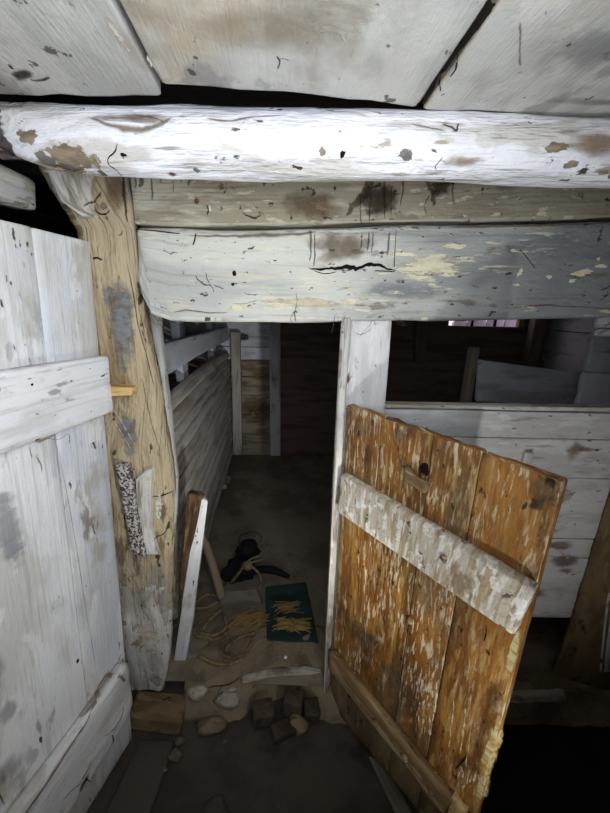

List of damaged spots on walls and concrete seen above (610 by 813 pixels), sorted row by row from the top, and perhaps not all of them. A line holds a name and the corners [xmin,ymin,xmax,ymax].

crack [309,236,396,274]
peeling [391,243,467,281]
peeling [530,478,556,509]
peeling [506,630,520,677]
peeling [476,715,503,800]